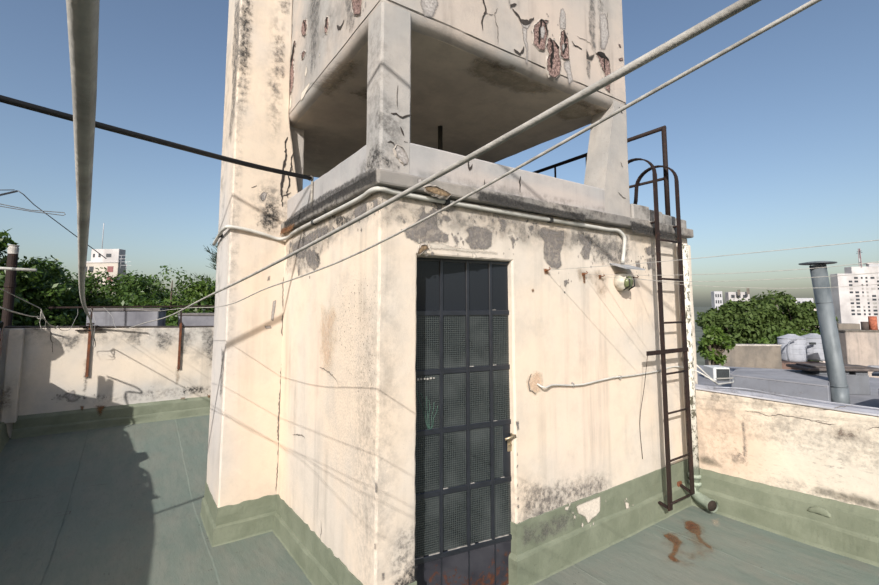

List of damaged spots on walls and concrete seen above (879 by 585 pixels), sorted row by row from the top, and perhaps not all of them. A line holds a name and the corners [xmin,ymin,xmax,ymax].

spalling [289,18,310,100]
spalling [351,0,366,17]
spalling [510,3,574,84]
spalling [595,13,623,96]
leakage [260,149,399,231]
peeling [565,496,606,527]
rust [664,534,681,562]
rust [685,521,711,548]